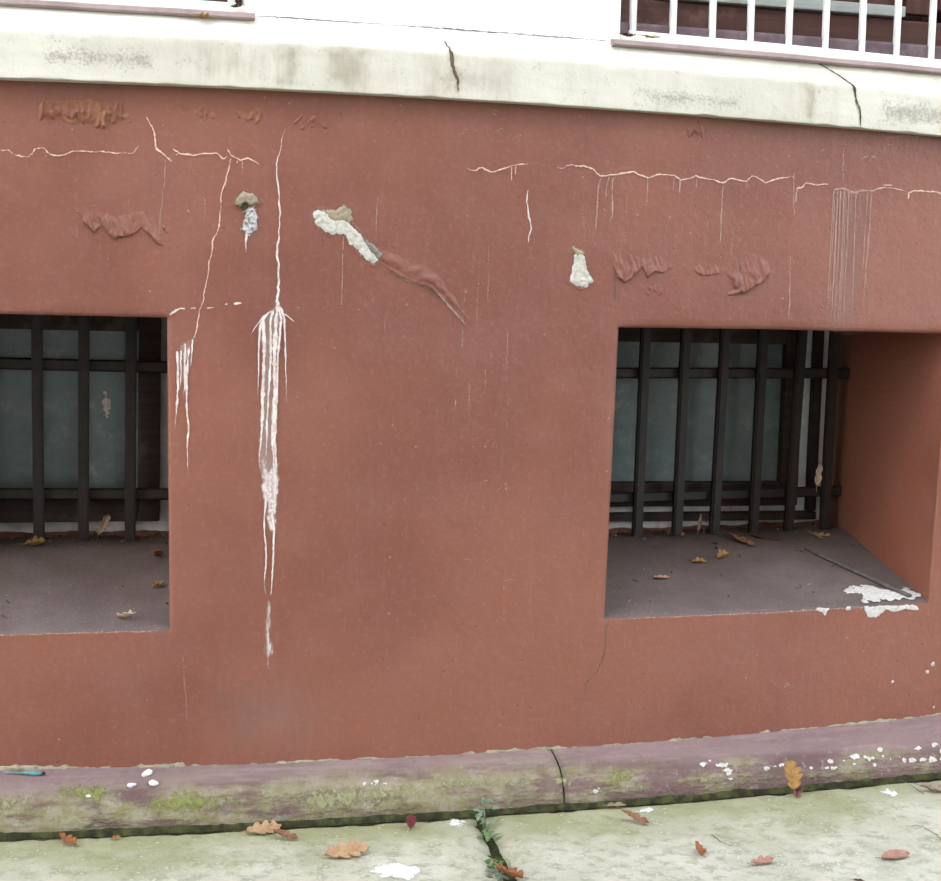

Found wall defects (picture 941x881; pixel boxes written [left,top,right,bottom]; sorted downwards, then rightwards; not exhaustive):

crack [261,16,604,91]
crack [820,64,861,128]
crack [2,116,284,338]
crack [560,164,828,242]
leakage [828,188,874,305]
crack [874,184,941,199]
leakage [253,301,293,593]
peeling [680,585,921,618]